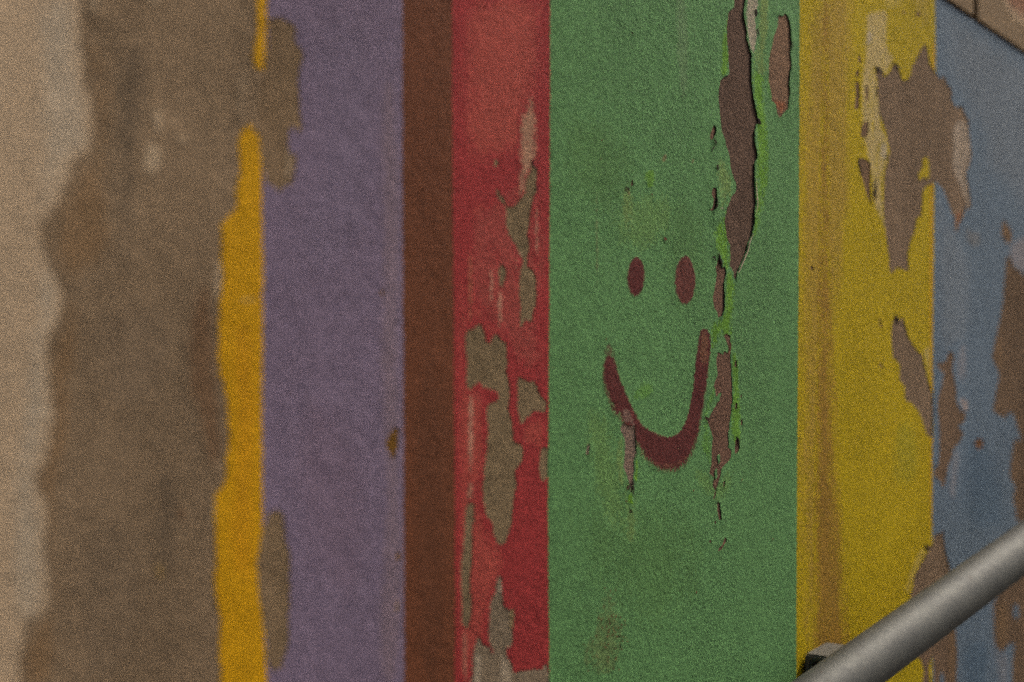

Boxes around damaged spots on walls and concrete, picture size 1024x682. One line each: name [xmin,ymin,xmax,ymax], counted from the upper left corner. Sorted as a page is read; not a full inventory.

leakage [29,0,91,220]
leakage [111,35,153,277]
peeling [496,160,537,327]
peeling [710,0,759,317]
peeling [769,14,791,118]
peeling [855,43,971,274]
leakage [182,277,259,585]
peeling [461,323,548,629]
peeling [705,334,742,523]
peeling [879,317,966,488]
peeling [992,256,1024,522]
peeling [471,575,549,682]